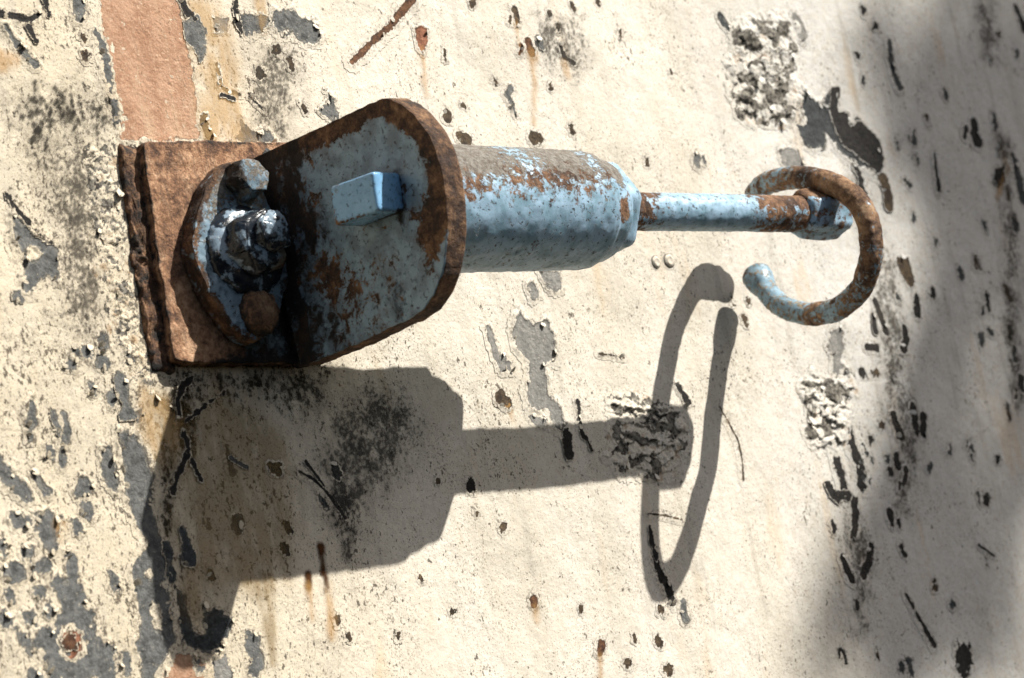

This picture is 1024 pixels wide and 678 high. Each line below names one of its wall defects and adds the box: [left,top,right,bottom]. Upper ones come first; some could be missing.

peeling [715,10,732,35]
peeling [789,9,810,46]
peeling [776,78,944,212]
peeling [0,0,330,678]
peeling [479,270,575,461]
peeling [823,251,939,615]
rust [305,543,329,590]